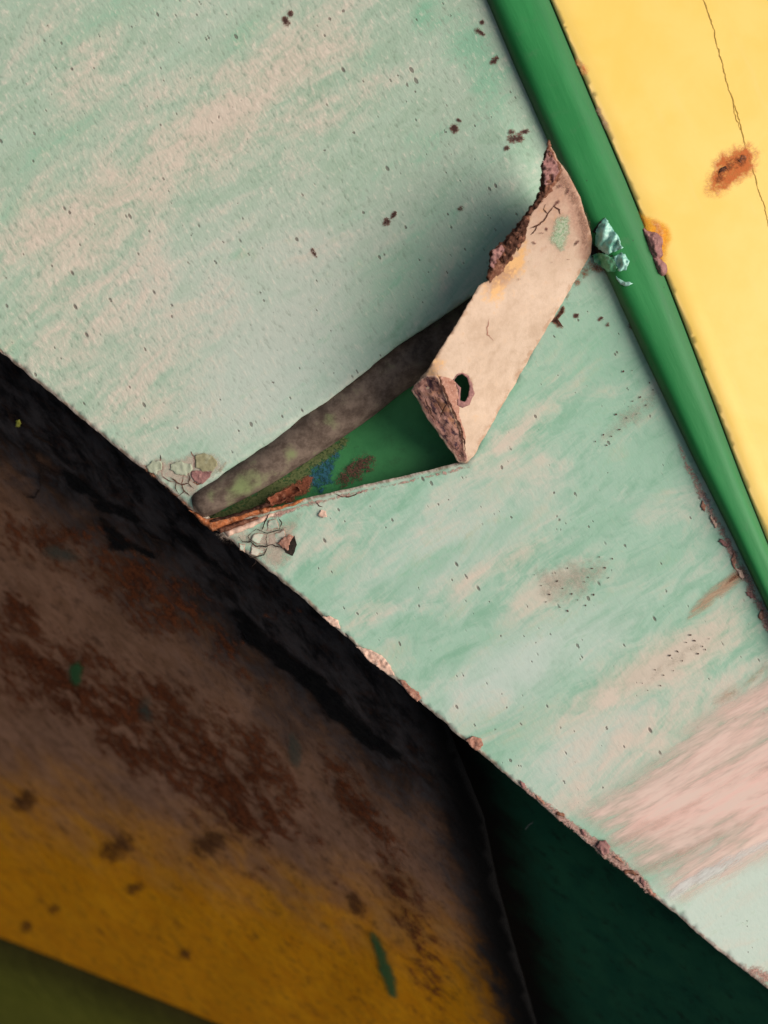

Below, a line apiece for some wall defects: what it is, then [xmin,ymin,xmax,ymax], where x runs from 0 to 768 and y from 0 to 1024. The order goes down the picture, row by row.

corrosion [707,143,758,194]
peeling [490,149,559,268]
corrosion [643,217,670,276]
peeling [146,453,218,494]
peeling [63,470,156,559]
peeling [210,486,301,564]
corrosion [680,447,768,631]
peeling [232,610,403,760]
peeling [356,646,421,702]
corrosion [0,591,325,858]
peeling [466,736,483,751]
peeling [596,840,610,856]